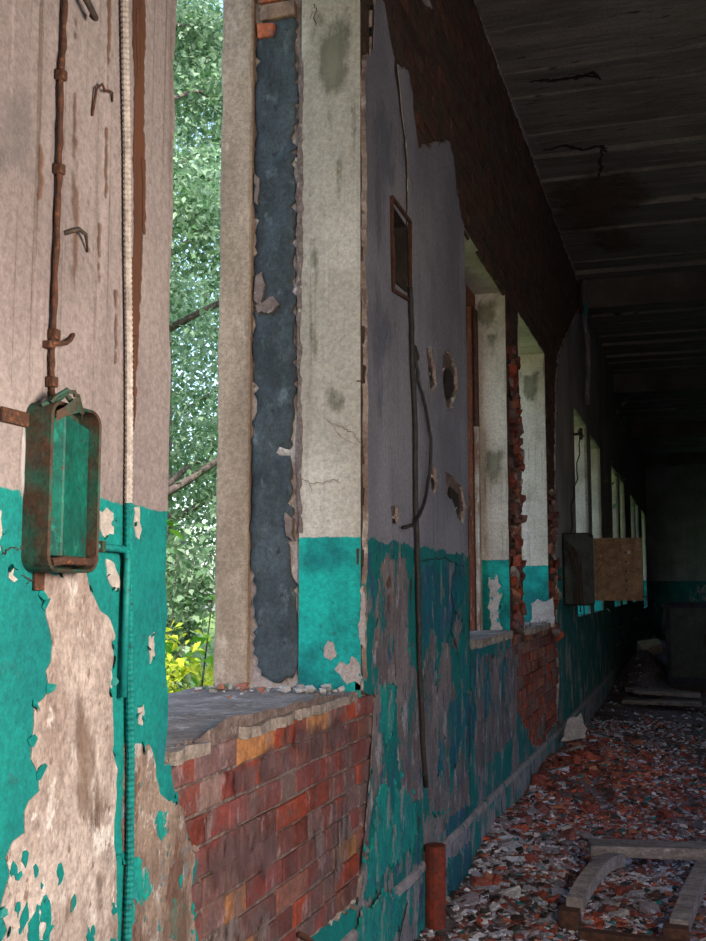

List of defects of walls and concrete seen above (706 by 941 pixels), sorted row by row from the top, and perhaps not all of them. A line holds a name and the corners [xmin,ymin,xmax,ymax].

water stain [320,22,350,92]
crack [529,71,601,83]
crack [542,144,608,177]
rust [132,0,146,430]
flaking render [131,0,579,941]
peeling [0,510,18,582]
peeling [99,508,118,540]
peeling [105,559,120,592]
peeling [0,573,127,941]